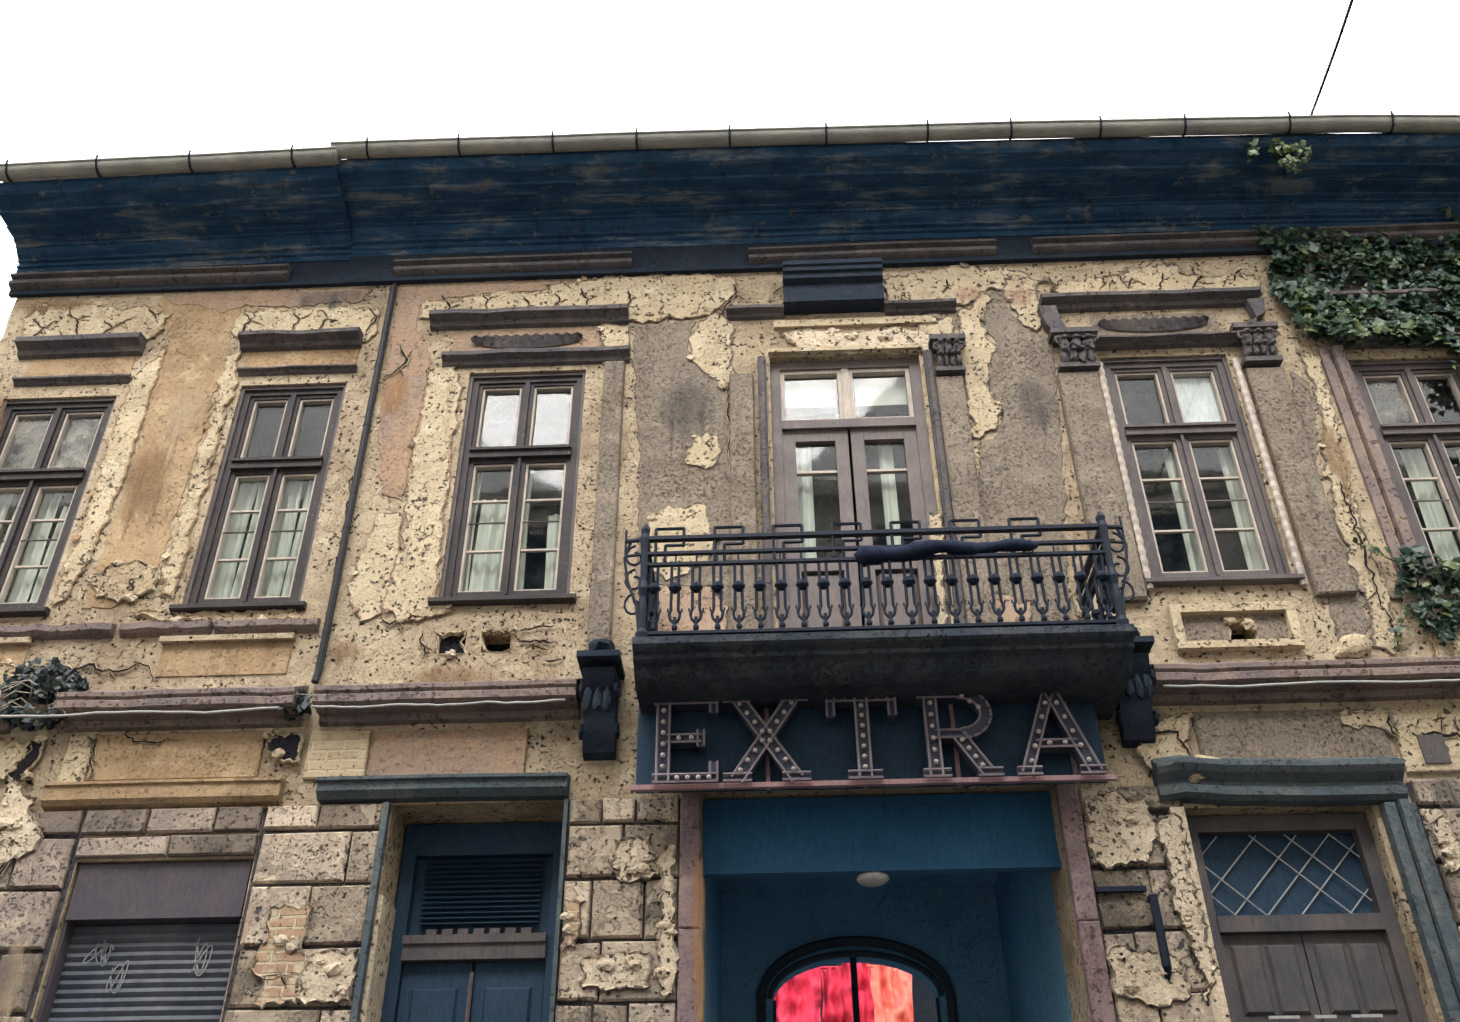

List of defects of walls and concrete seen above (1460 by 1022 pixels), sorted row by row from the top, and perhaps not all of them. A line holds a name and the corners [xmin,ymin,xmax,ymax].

crack [33,308,163,336]
flaking render [778,258,1263,439]
flaking render [21,301,381,624]
flaking render [346,366,517,659]
flaking render [683,432,723,470]
spalling [0,658,58,695]
spalling [0,735,48,867]
spalling [250,902,360,1010]
spalling [1083,789,1218,1009]